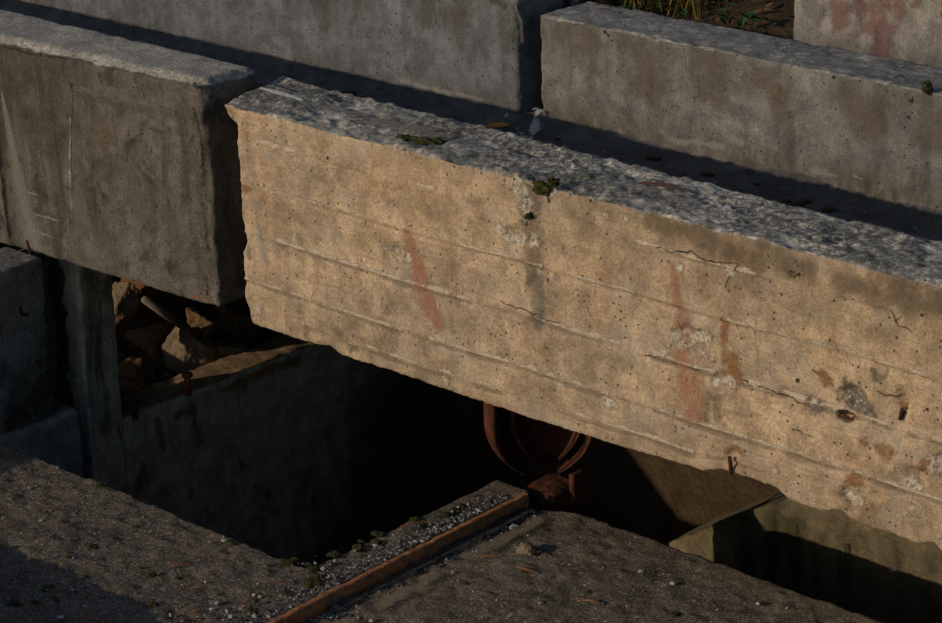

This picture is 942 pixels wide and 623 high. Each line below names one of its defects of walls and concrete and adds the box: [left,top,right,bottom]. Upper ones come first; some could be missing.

spalling [493,173,541,251]
crack [656,247,738,288]
crack [501,301,562,323]
corrosion [720,318,743,385]
corrosion [818,370,832,387]
spalling [804,395,825,416]
spalling [838,377,878,423]
spalling [860,437,893,460]
spalling [839,485,872,507]
spalling [897,453,942,518]